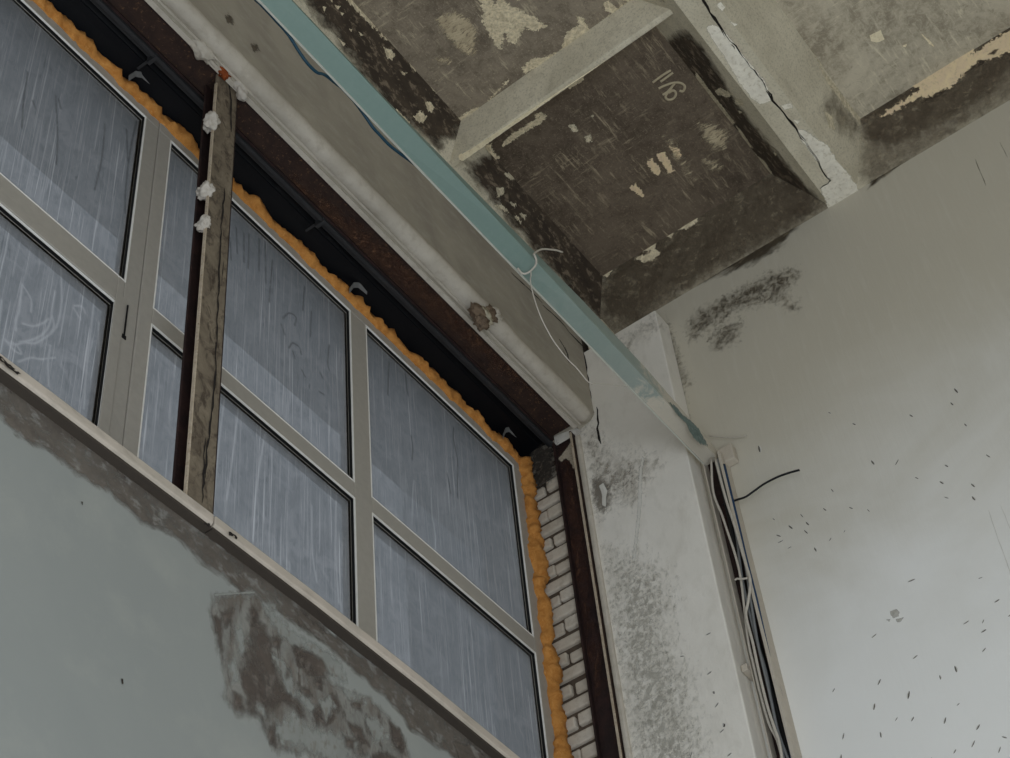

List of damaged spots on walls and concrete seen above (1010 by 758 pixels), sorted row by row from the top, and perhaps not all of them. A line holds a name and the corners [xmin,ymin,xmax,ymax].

peeling [323,0,395,60]
peeling [478,0,548,49]
peeling [521,0,631,74]
peeling [869,30,885,43]
peeling [396,87,434,123]
crack [702,0,831,189]
peeling [881,31,1010,117]
peeling [485,112,547,159]
peeling [647,145,682,176]
peeling [494,172,527,224]
peeling [636,244,660,263]
peeling [211,591,410,758]